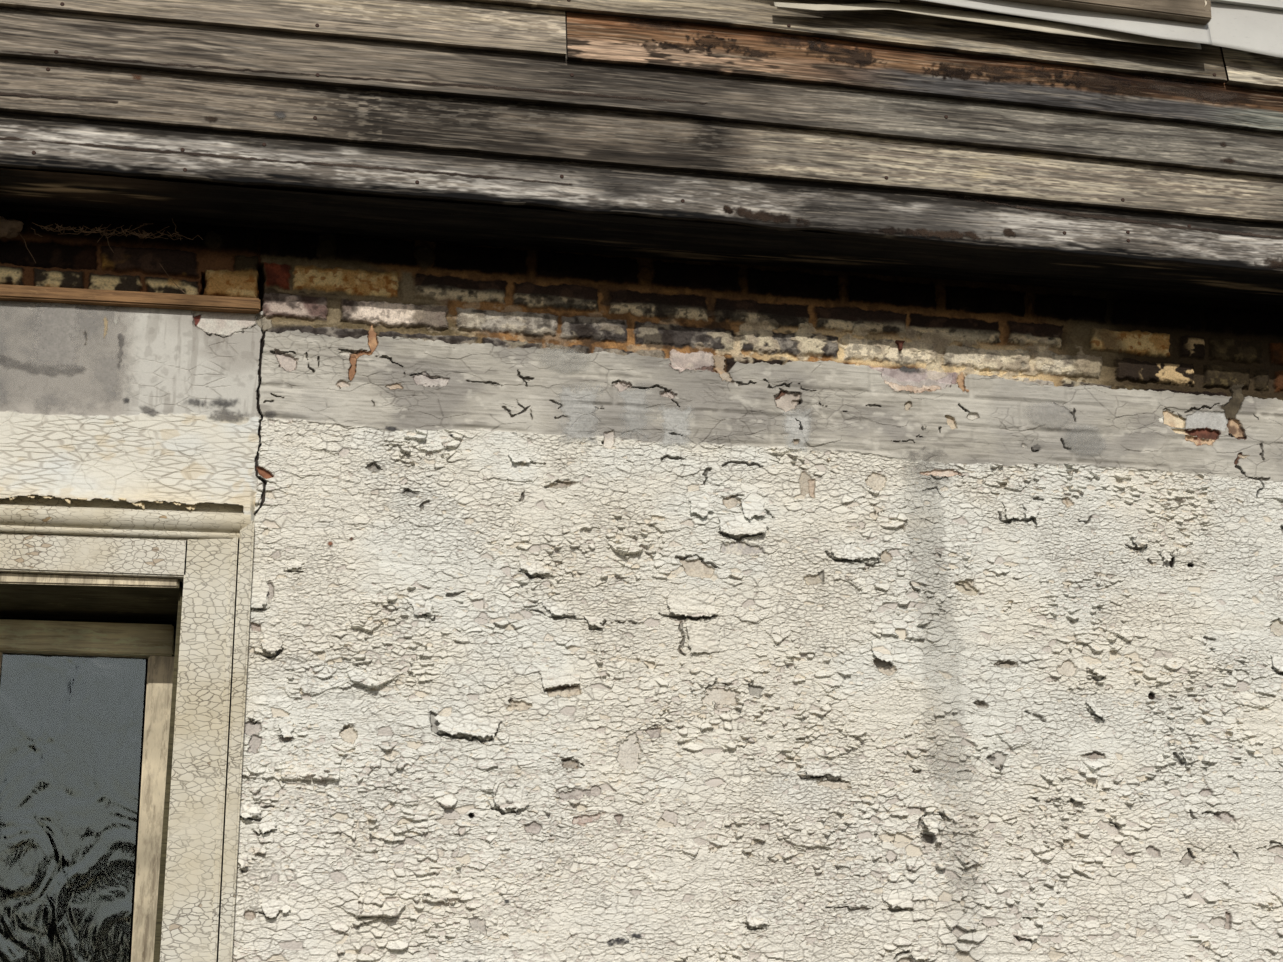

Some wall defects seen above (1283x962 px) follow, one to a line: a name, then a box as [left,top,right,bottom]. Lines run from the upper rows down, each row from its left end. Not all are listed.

flaking render [0,210,1283,446]
crack [254,314,274,515]
peeling [688,462,769,555]
peeling [804,542,892,585]
peeling [666,595,721,655]
peeling [871,640,897,676]
peeling [539,669,581,697]
peeling [430,700,532,742]
peeling [802,762,851,790]
peeling [237,800,277,868]
peeling [491,787,542,834]
peeling [917,808,963,843]